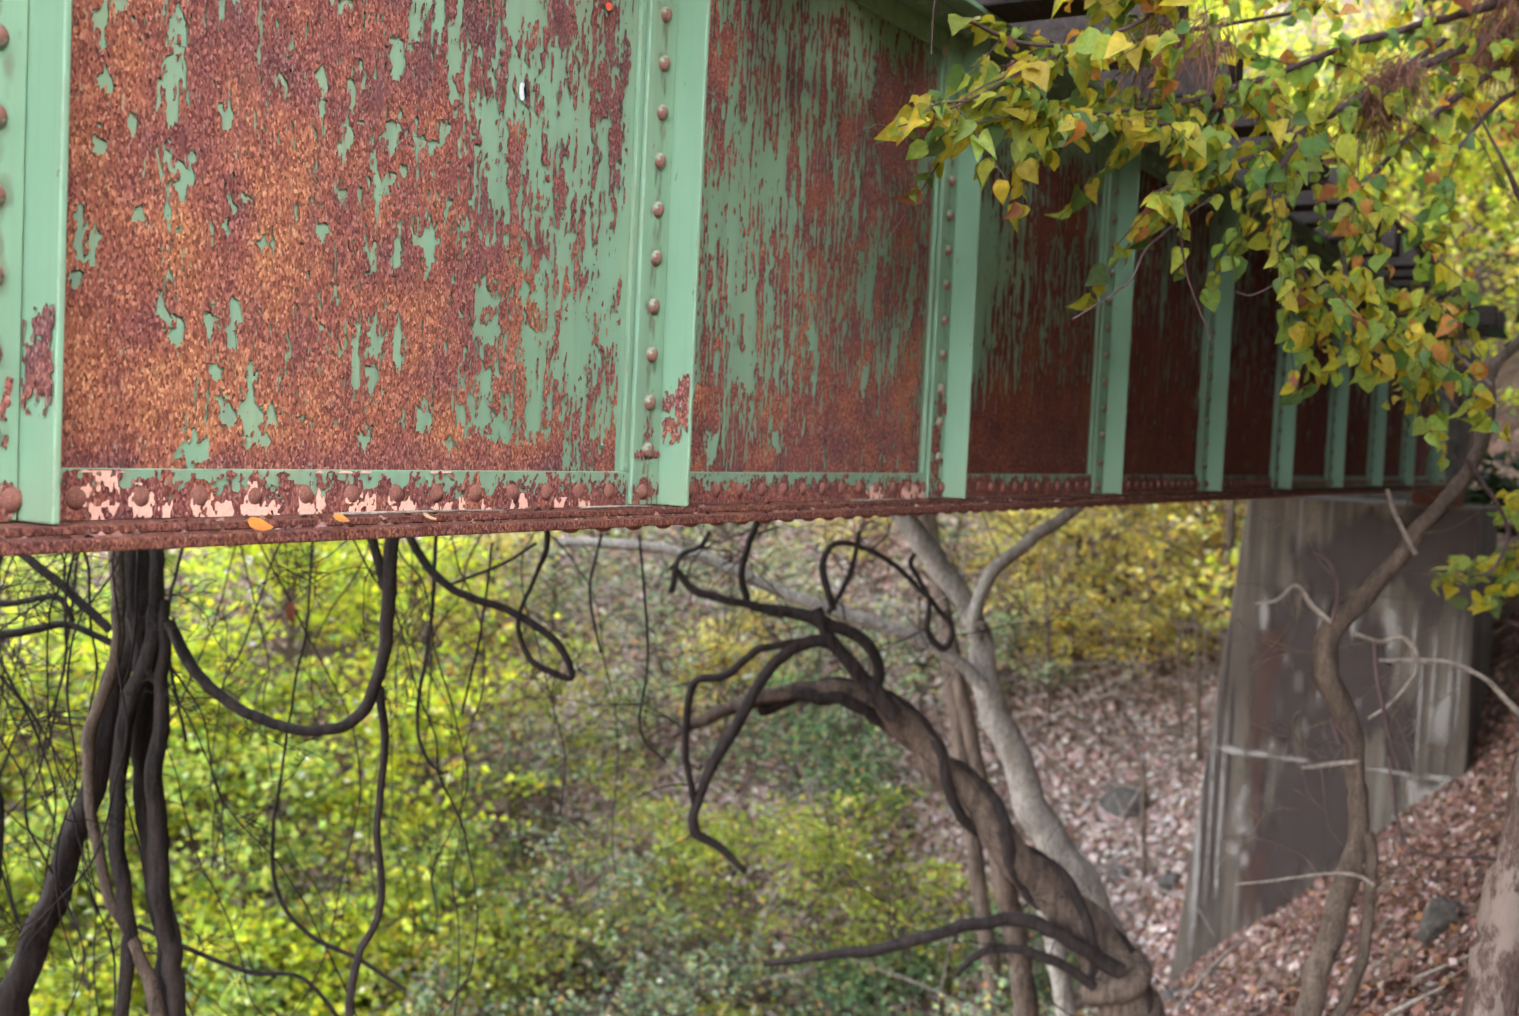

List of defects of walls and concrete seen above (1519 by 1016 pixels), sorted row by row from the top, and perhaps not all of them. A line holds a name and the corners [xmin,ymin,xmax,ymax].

peeling [519,79,529,101]
rust [0,0,947,521]
rust [966,132,1104,497]
rust [1122,170,1280,493]
rust [1293,267,1334,476]
rust [1344,300,1431,476]
peeling [81,470,280,520]
peeling [298,470,372,514]
peeling [345,492,491,512]
peeling [510,493,530,509]